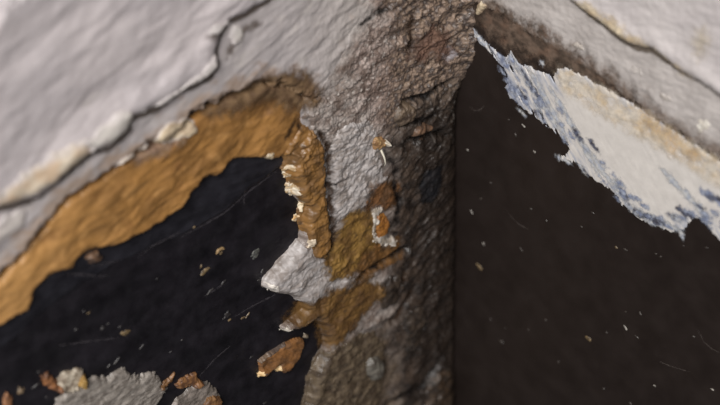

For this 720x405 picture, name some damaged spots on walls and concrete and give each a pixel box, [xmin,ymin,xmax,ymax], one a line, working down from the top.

crack [0,0,271,211]
peeling [0,0,477,405]
corrosion [283,178,402,347]
leakage [557,71,720,184]
crack [571,0,720,96]